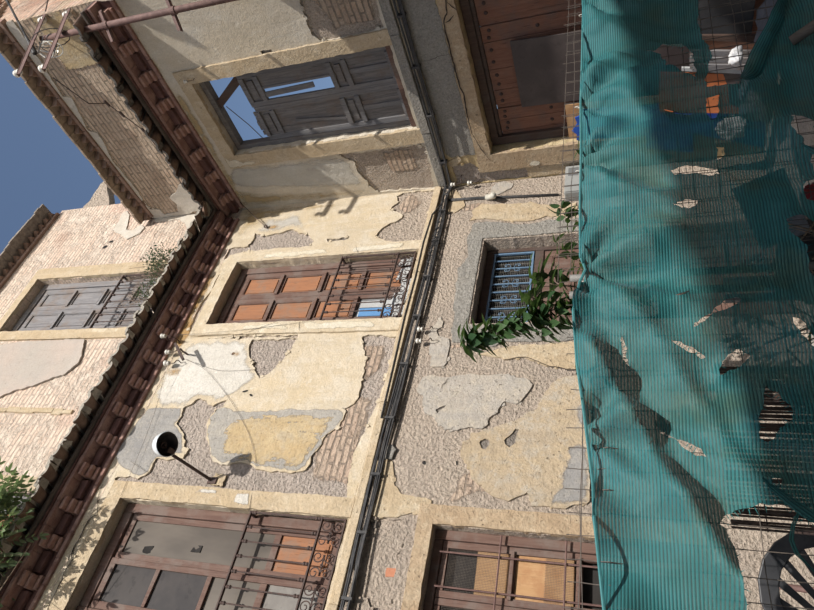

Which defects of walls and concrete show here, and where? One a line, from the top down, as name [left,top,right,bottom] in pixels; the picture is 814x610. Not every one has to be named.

flaking render [299,0,383,42]
crack [428,0,490,160]
flaking render [340,144,434,252]
flaking render [0,339,85,398]
flaking render [116,321,395,504]
flaking render [416,317,591,510]
crack [47,486,102,610]
flaking render [354,444,432,610]